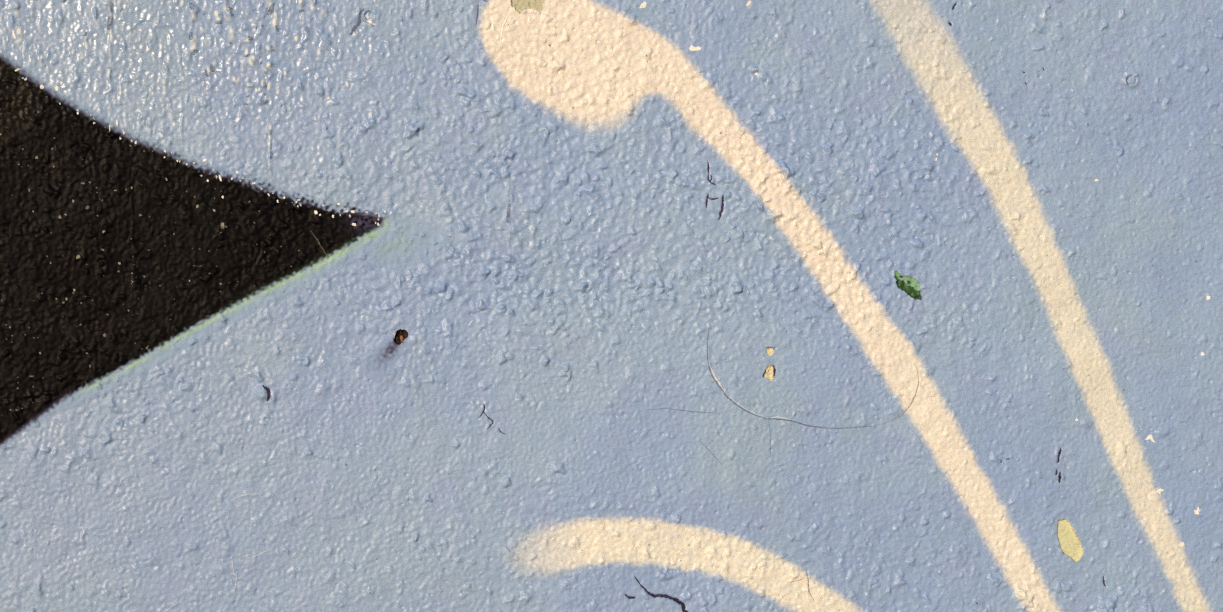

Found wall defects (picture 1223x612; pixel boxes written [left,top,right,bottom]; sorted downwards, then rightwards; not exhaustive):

peeling [499,0,551,49]
peeling [1057,519,1084,562]
crack [625,576,688,612]